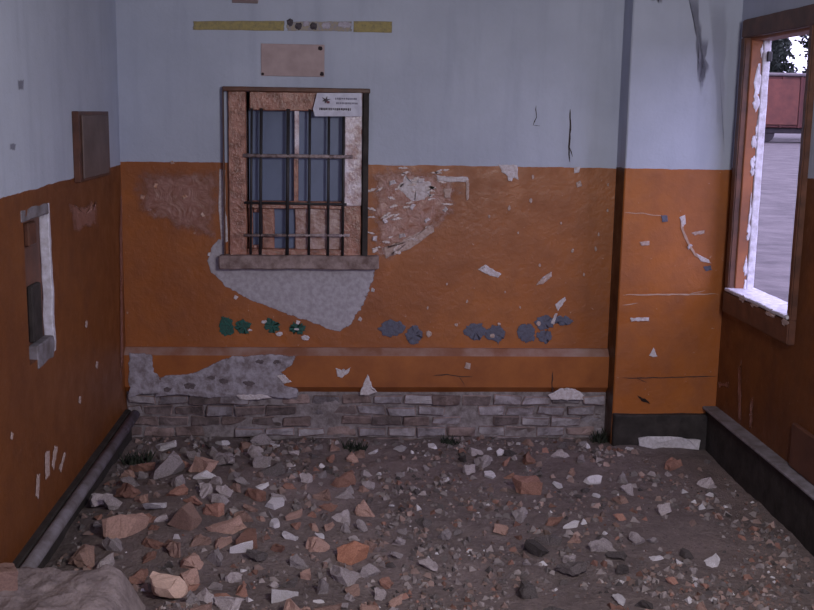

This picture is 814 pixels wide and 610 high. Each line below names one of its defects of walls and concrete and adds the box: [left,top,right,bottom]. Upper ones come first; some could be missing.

crack [566,111,574,162]
peeling [498,164,518,181]
peeling [368,167,469,259]
peeling [140,169,375,340]
peeling [679,215,712,271]
flaking render [120,200,606,488]
spalling [502,457,543,495]
spalling [67,544,96,567]
spalling [93,483,266,598]
spalling [354,499,375,517]
spalling [493,523,509,535]